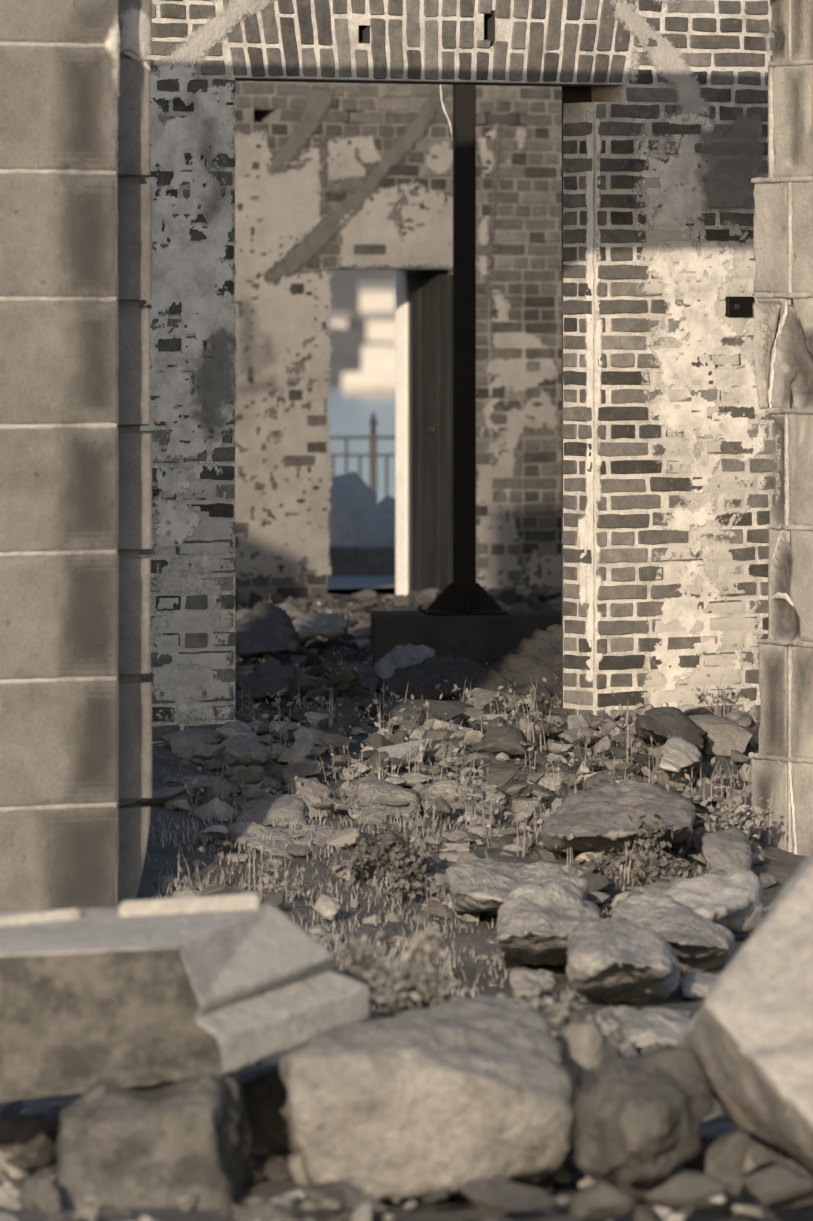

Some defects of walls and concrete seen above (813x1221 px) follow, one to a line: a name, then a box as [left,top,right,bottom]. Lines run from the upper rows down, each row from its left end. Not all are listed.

flaking render [477,124,528,178]
flaking render [476,215,492,280]
flaking render [144,58,453,725]
flaking render [476,289,562,593]
peeling [632,112,813,712]
crack [767,301,787,408]
crack [772,530,783,559]
crack [771,592,794,607]